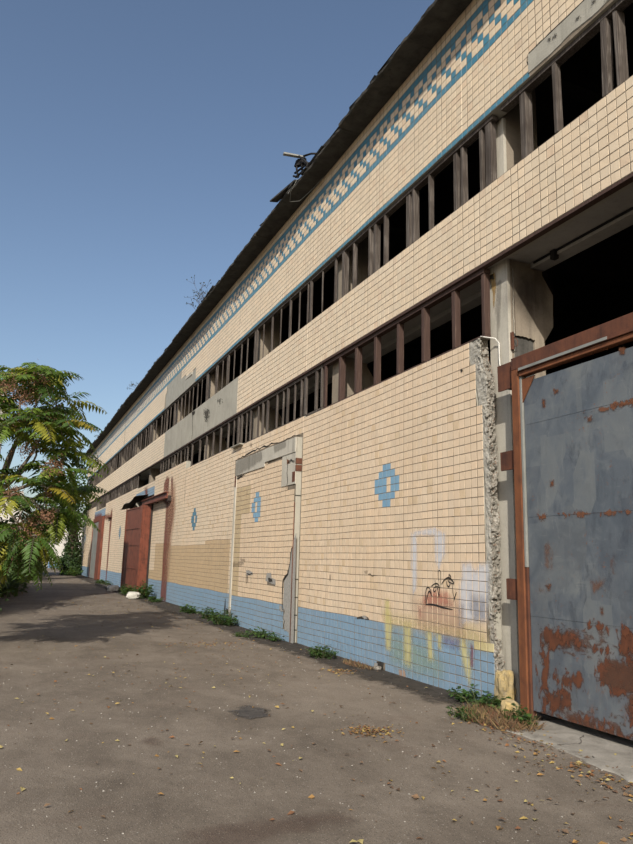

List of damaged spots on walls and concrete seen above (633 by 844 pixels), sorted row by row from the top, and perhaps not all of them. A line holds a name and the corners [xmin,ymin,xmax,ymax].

corrosion [598,398,633,412]
spalling [468,337,505,704]
spalling [266,535,296,643]
corrosion [535,608,633,740]